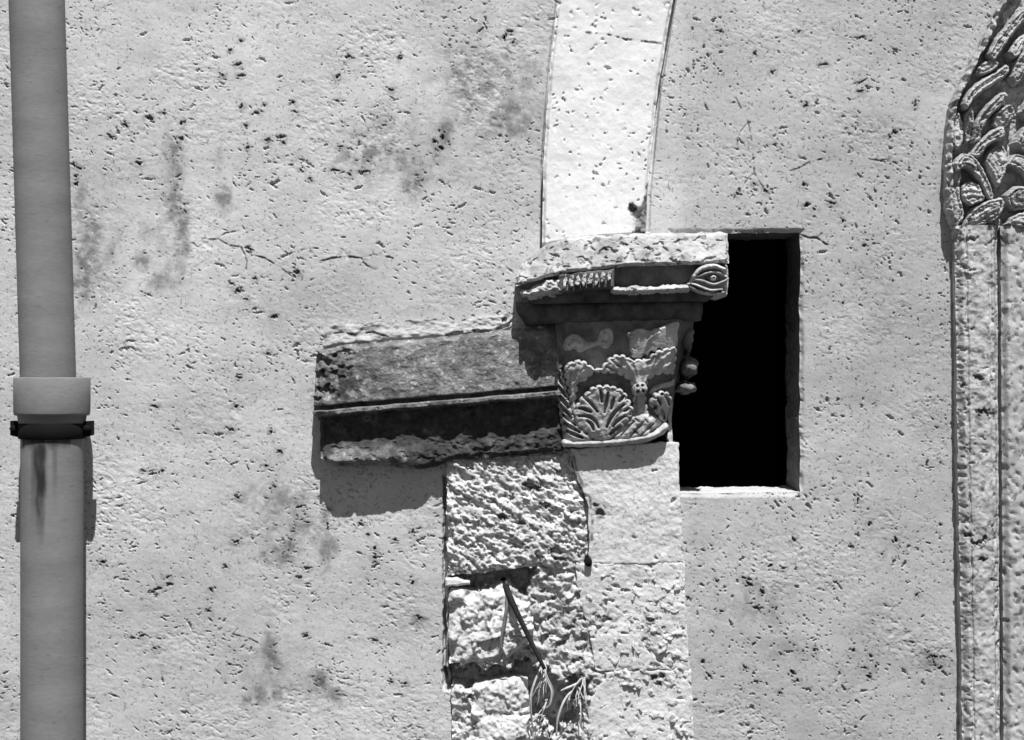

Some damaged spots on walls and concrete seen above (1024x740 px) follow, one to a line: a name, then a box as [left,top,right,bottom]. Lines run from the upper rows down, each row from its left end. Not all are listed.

damp [453,61,493,96]
damp [363,147,405,169]
damp [74,221,100,297]
crack [209,232,286,273]
crack [322,256,393,269]